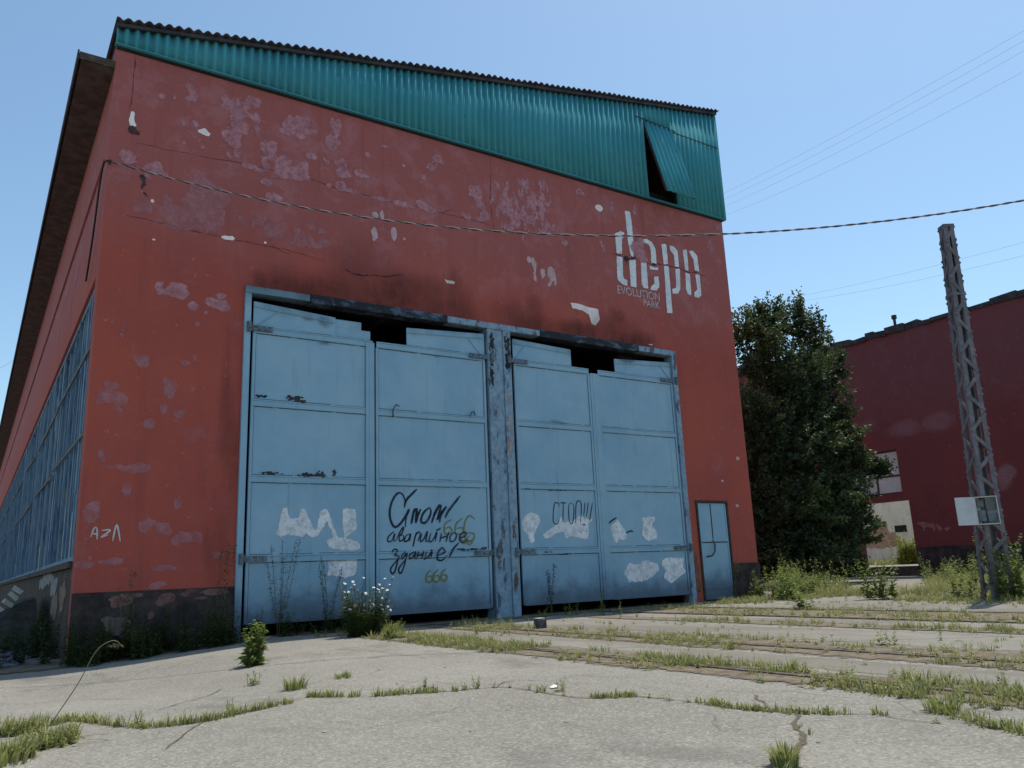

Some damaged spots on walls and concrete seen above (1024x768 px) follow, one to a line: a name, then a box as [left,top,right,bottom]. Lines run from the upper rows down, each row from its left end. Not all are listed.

peeling [181,94,371,202]
peeling [461,172,555,241]
peeling [155,281,230,326]
spalling [101,565,229,640]